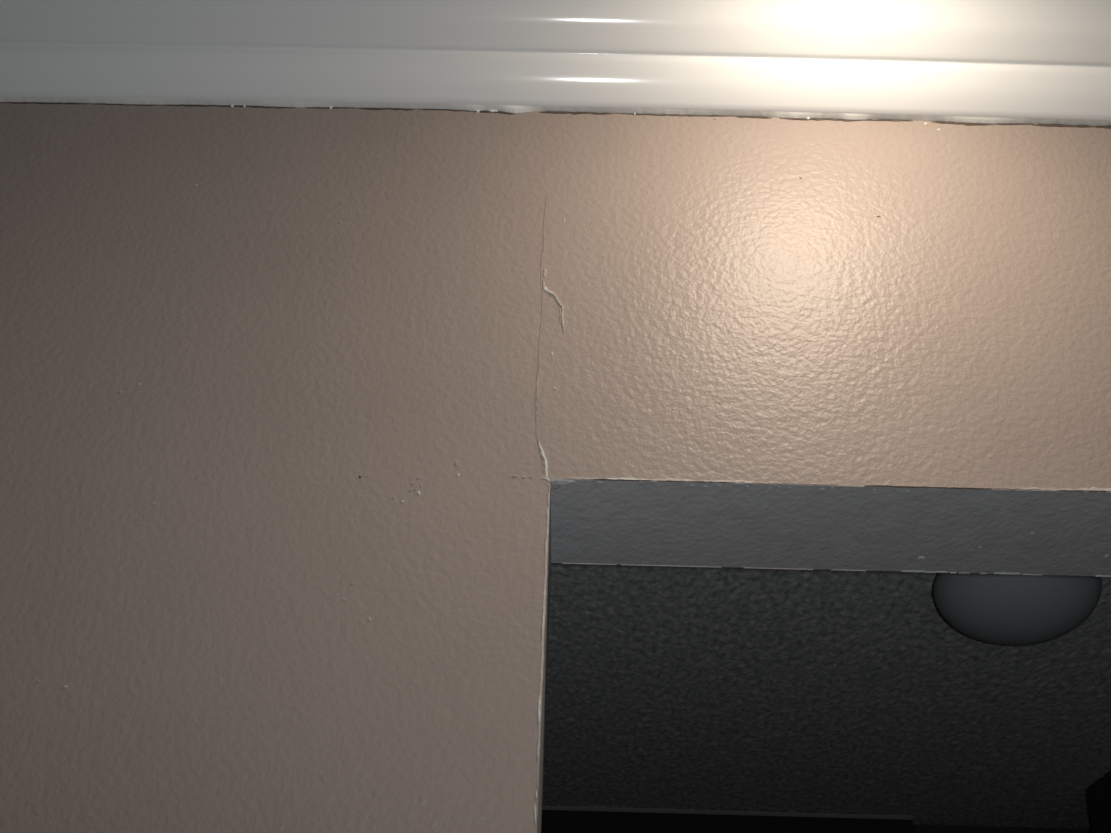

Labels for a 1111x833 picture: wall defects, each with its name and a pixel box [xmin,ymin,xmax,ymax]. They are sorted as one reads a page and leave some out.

crack [535,202,565,478]